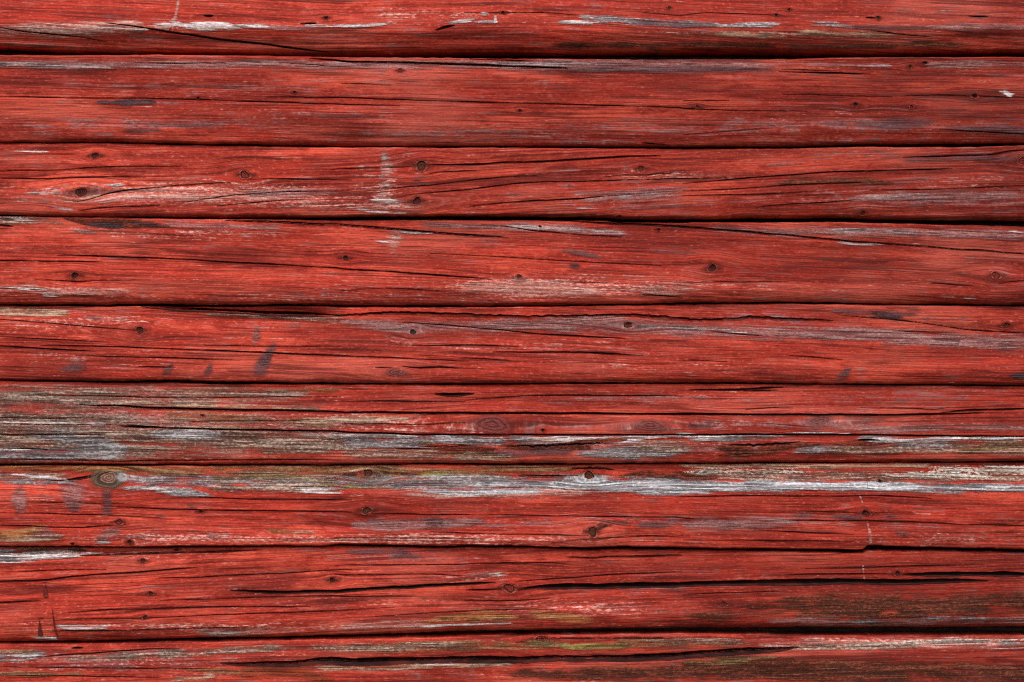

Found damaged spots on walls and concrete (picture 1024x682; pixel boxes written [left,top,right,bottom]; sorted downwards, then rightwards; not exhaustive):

crack [2,129,1024,368]
peeling [0,388,1024,497]
crack [0,495,1024,677]